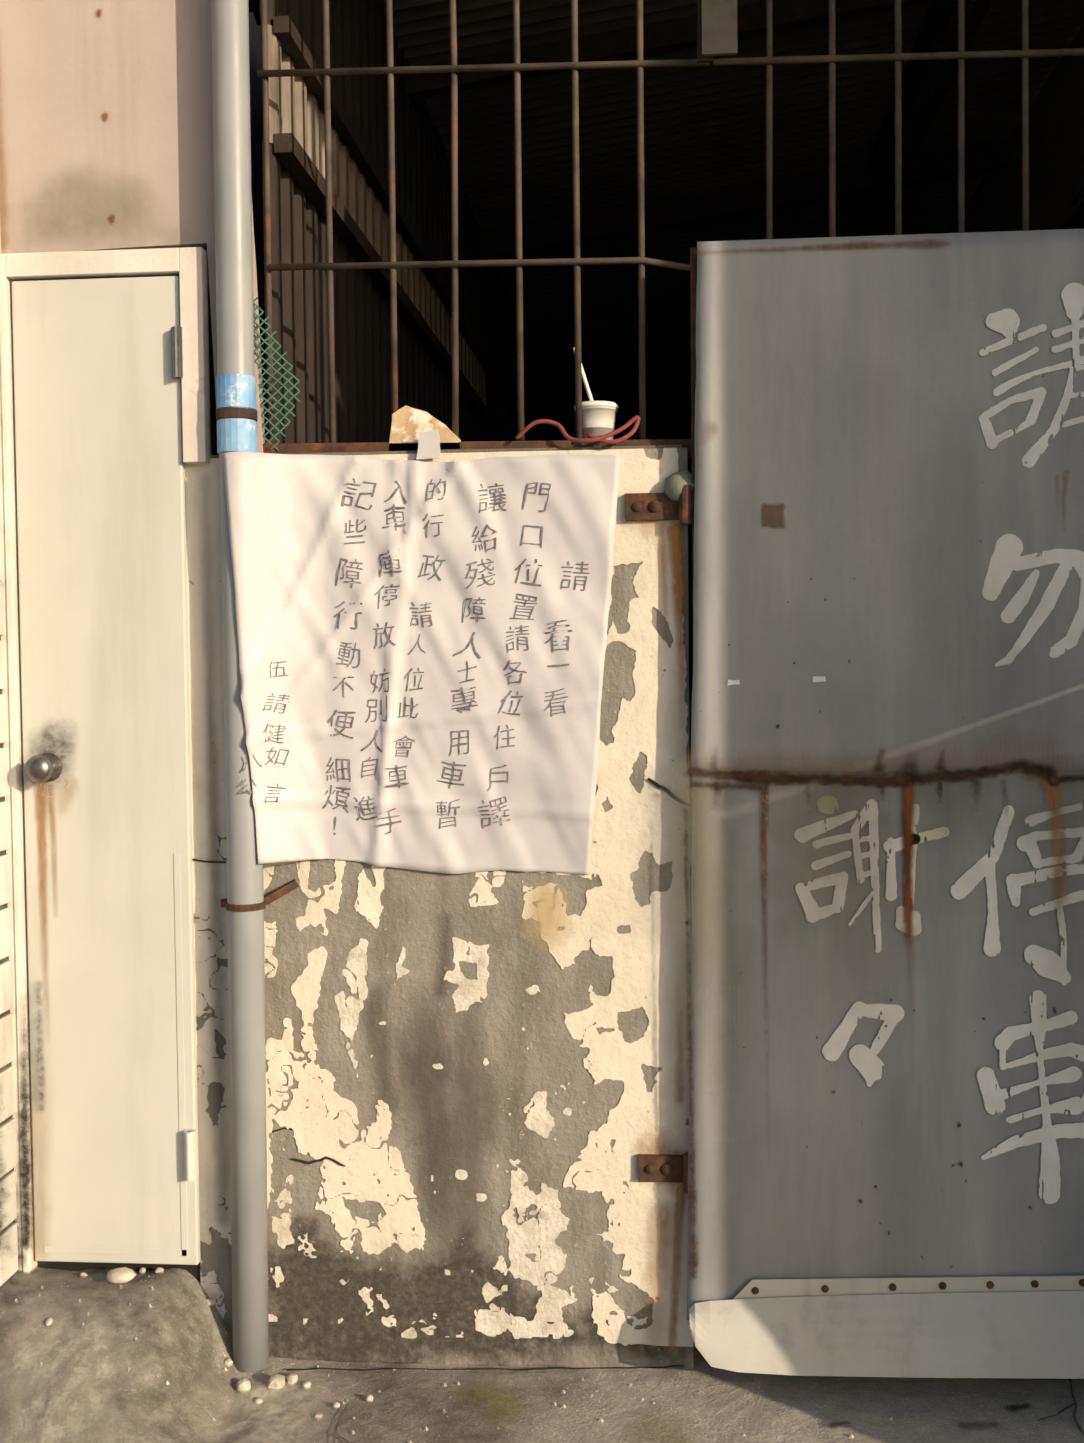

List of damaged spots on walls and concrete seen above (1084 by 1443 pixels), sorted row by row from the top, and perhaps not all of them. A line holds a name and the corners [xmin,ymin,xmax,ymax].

peeling [644,448,688,472]
peeling [651,524,690,797]
rust [36,782,53,924]
peeling [595,784,613,813]
rust [688,761,1084,939]
peeling [194,916,228,1126]
leakage [411,1045,449,1166]
peeling [263,851,693,1369]
peeling [200,1226,233,1332]
leakage [268,1219,671,1364]